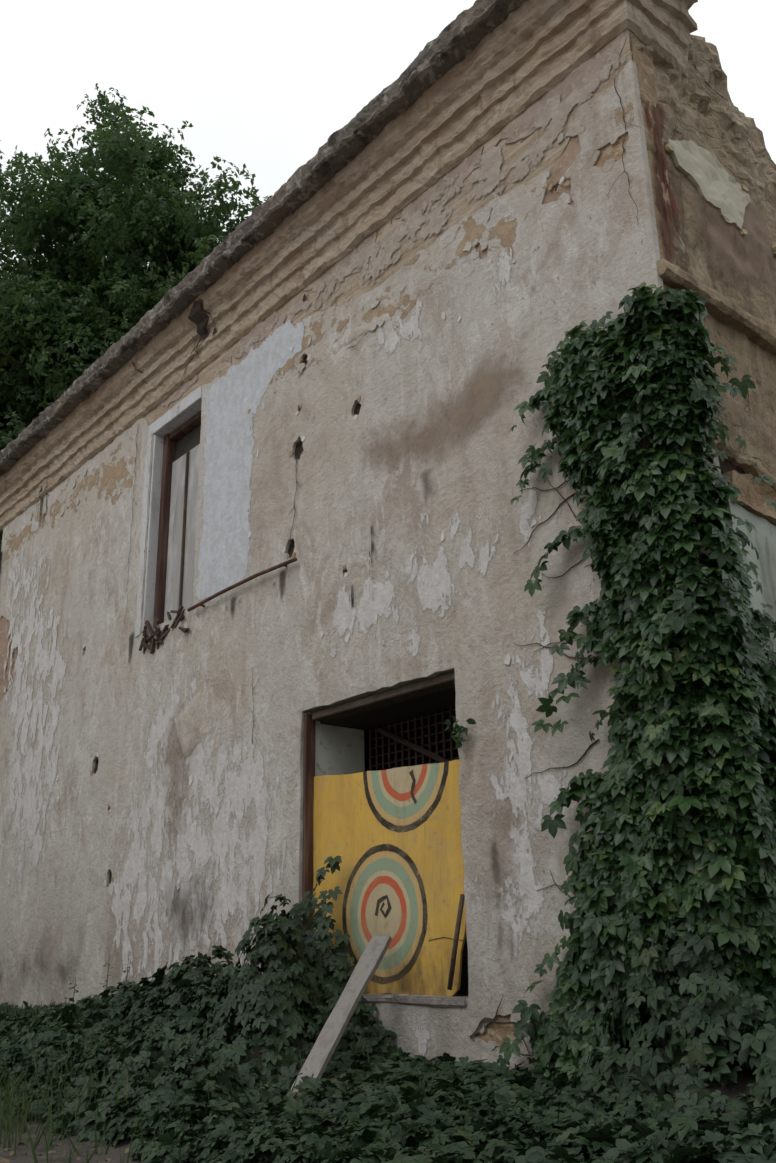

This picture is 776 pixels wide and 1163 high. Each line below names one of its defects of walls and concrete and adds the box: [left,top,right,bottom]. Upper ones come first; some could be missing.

corrosion [645,101,682,263]
flaking render [143,29,634,601]
damp [409,370,518,454]
peeling [320,473,562,675]
peeling [483,609,567,961]